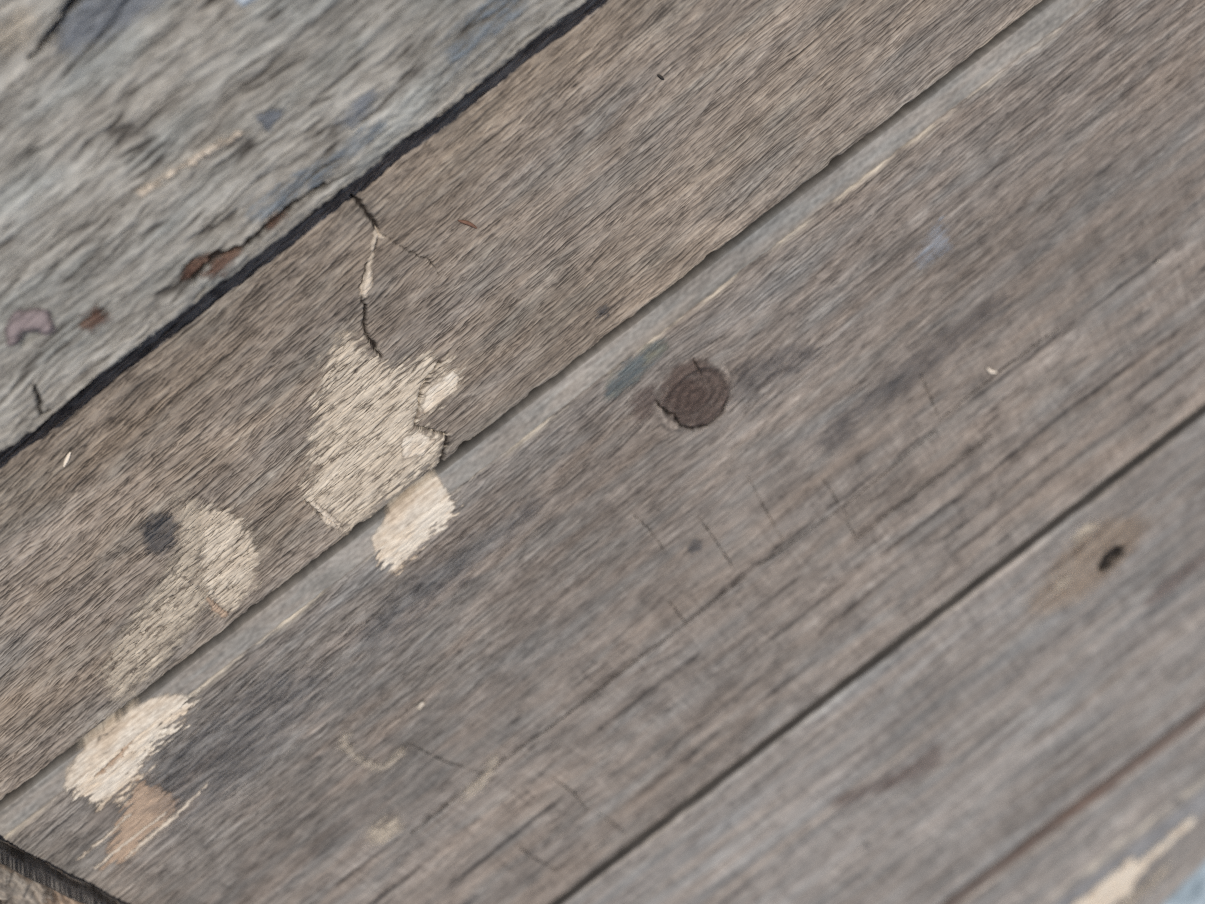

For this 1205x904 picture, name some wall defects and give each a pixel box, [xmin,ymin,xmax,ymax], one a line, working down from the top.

crack [350,193,433,356]
peeling [298,331,469,578]
peeling [63,493,261,871]
peeling [1073,815,1196,904]